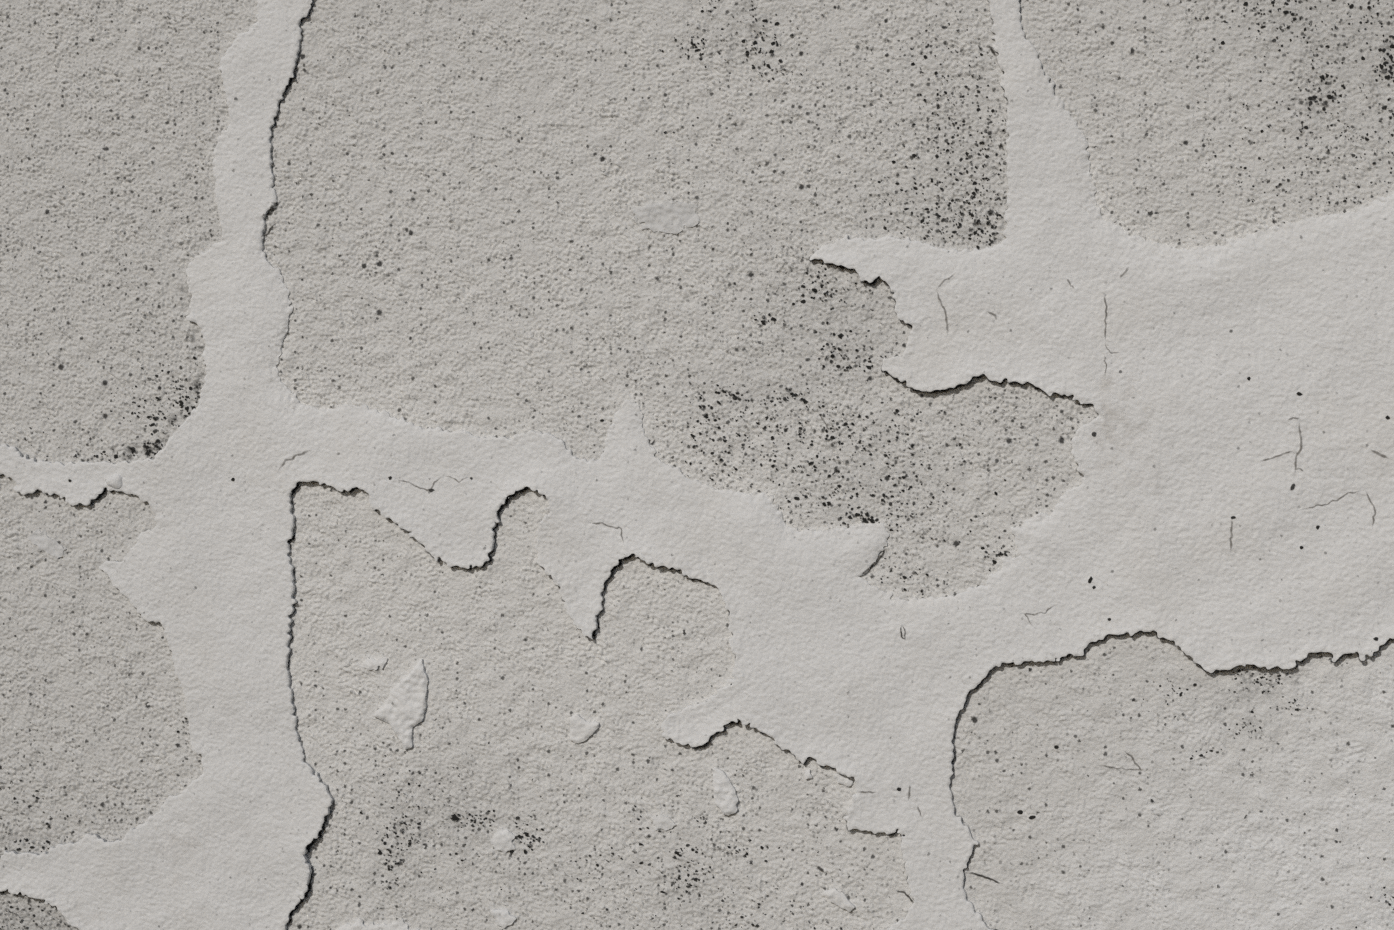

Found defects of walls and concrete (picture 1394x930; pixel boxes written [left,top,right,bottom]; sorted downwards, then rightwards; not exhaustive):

peeling [0,0,258,465]
peeling [263,0,1099,601]
peeling [1019,0,1394,249]
peeling [0,889,79,930]
peeling [0,474,203,862]
peeling [287,481,914,930]
peeling [949,630,1394,930]